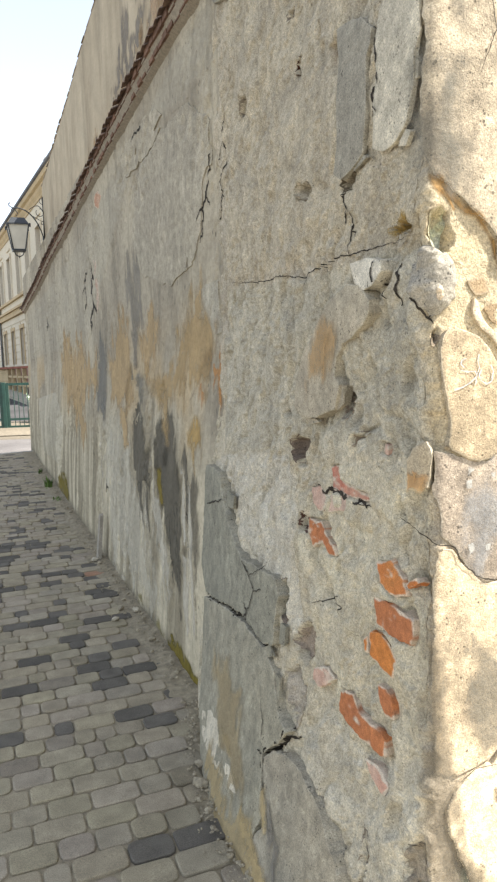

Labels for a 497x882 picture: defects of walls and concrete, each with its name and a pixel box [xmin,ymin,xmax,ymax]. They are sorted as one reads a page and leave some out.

crack [479,0,497,74]
flaking render [27,0,224,360]
crack [196,121,227,243]
crack [233,178,434,324]
leakage [96,334,107,417]
flaking render [102,412,133,476]
leakage [126,254,198,634]
flaking render [194,0,497,882]
crack [208,561,269,647]
crack [257,701,302,794]